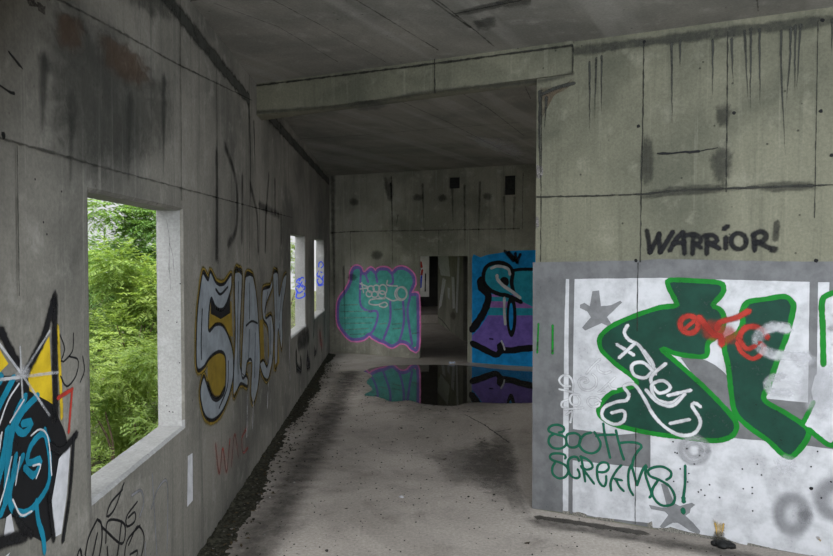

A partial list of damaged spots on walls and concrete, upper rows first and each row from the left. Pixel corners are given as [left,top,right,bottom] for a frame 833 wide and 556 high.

water stain [573,17,833,127]
water stain [538,82,576,163]
water stain [658,150,729,197]
water stain [763,182,804,192]